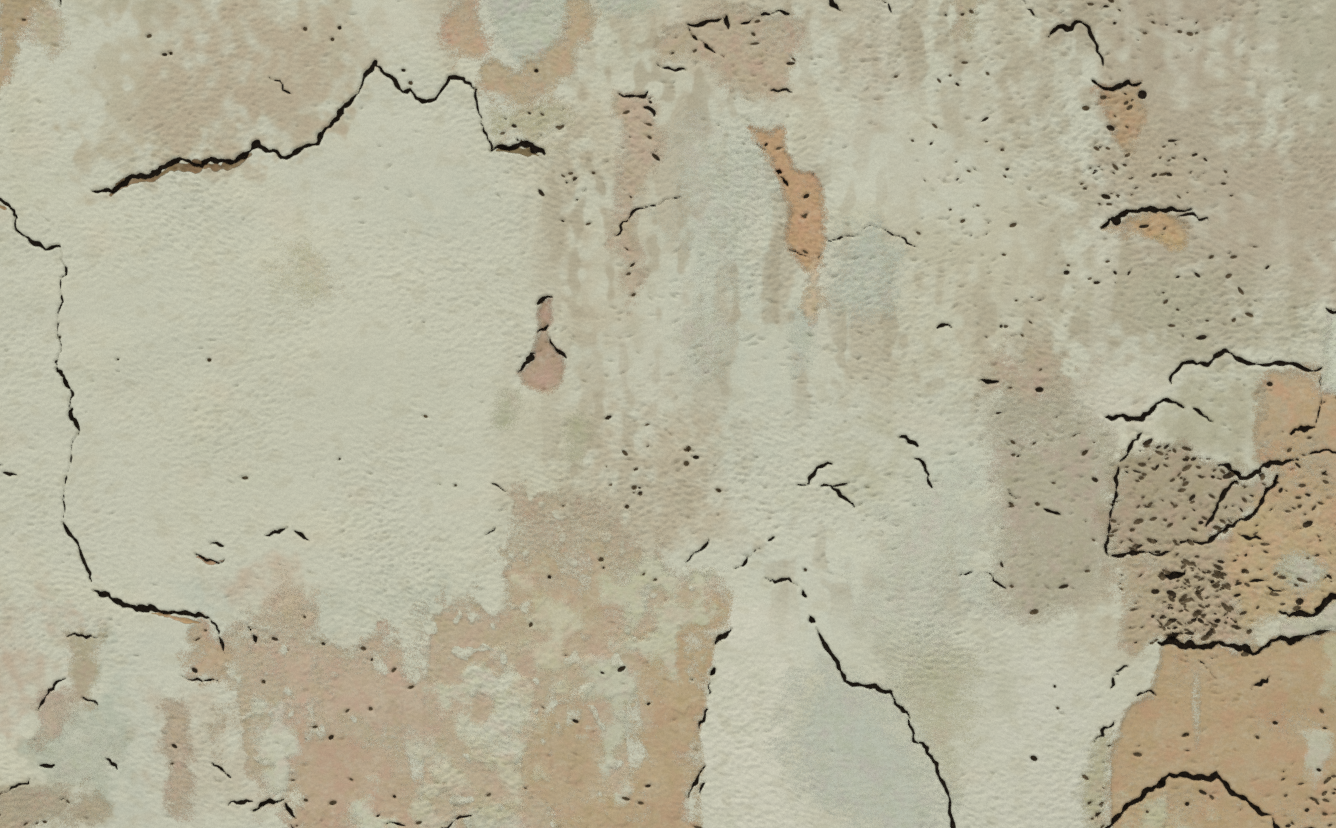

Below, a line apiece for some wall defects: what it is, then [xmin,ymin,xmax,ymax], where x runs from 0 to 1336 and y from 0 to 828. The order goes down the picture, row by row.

peeling [0,0,47,100]
crack [92,60,545,196]
peeling [516,298,568,395]
crack [0,198,257,682]
crack [1104,348,1336,580]
peeling [155,477,738,828]
crack [698,630,731,727]
crack [735,536,956,828]
crack [1110,665,1156,696]
spalling [1091,361,1336,828]
crack [1158,579,1336,686]
crack [1106,771,1313,828]